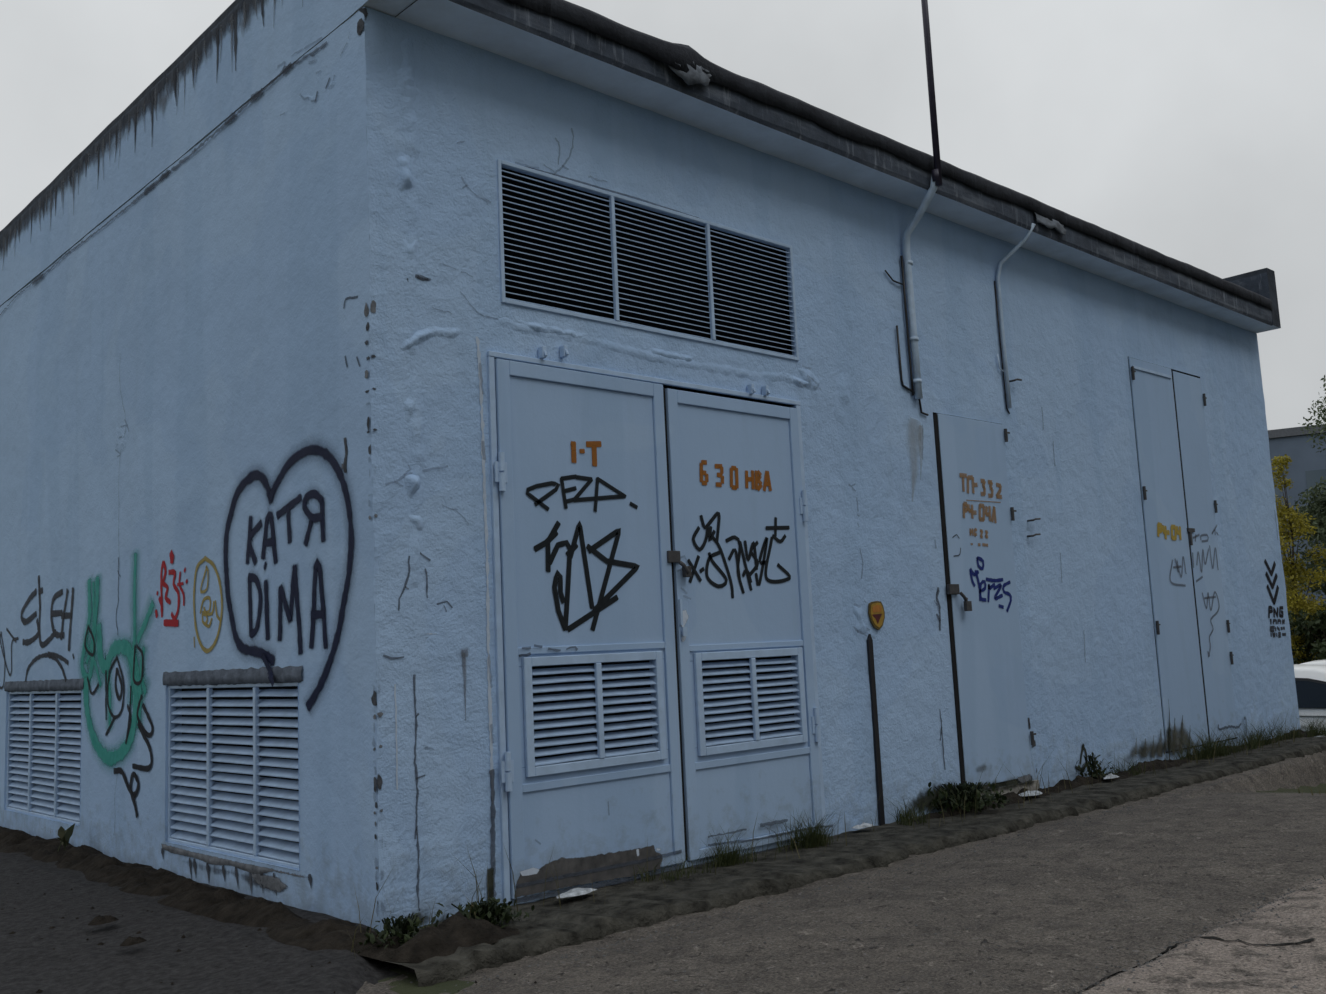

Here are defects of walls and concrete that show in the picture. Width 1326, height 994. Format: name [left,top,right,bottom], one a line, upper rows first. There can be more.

leakage [0,0,275,271]
spalling [364,300,376,393]
crack [398,552,453,612]
peeling [514,819,833,903]